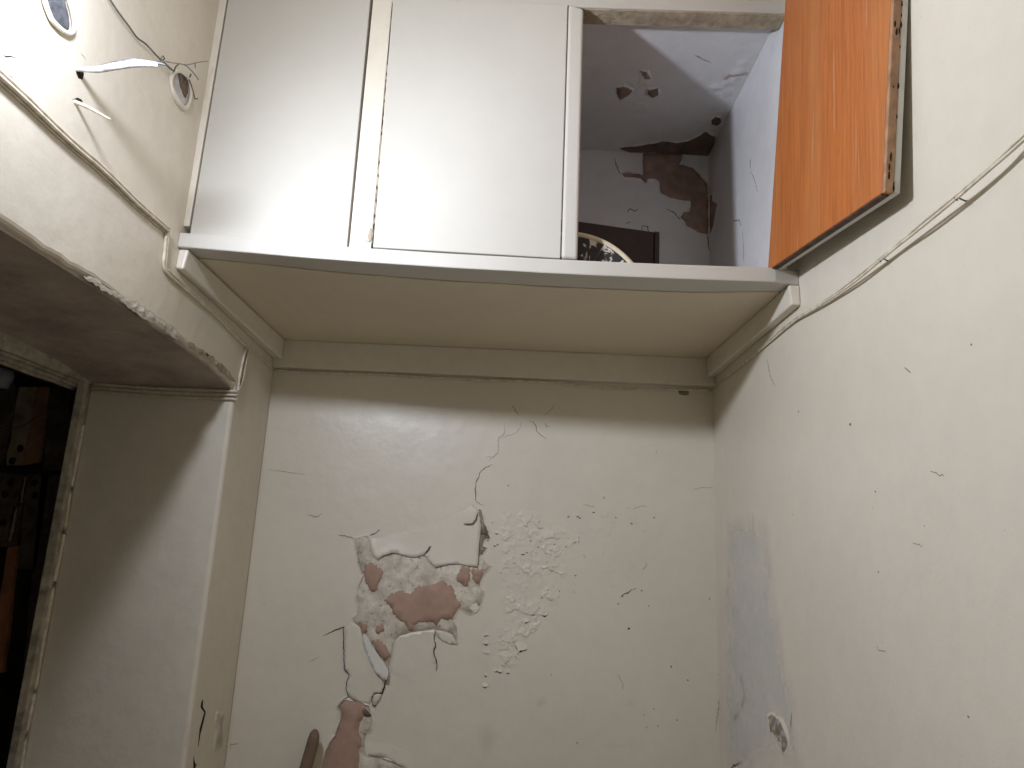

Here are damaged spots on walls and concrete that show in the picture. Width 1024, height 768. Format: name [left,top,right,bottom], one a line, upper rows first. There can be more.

peeling [603,69,661,115]
peeling [615,115,723,251]
flaking render [84,276,234,382]
crack [475,404,555,506]
peeling [318,504,493,768]
crack [193,700,206,768]
flaking render [767,710,792,759]